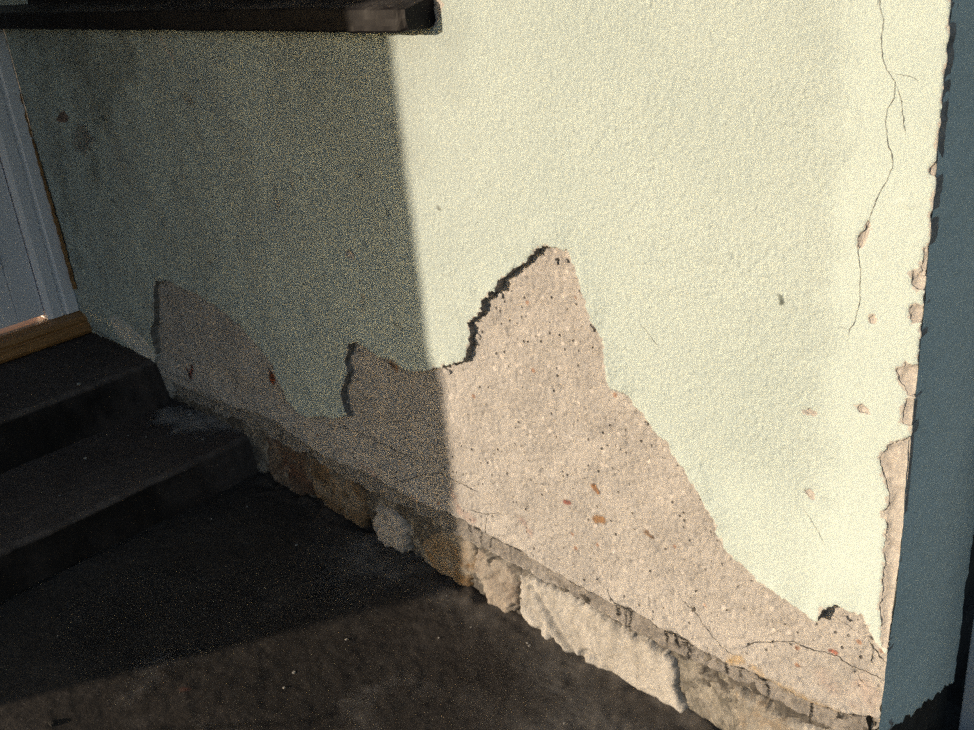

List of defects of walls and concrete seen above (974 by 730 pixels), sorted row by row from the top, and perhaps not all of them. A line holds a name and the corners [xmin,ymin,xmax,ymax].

crack [847,0,918,341]
flaking render [912,246,929,290]
flaking render [909,304,924,323]
flaking render [158,246,919,730]
crack [685,603,885,687]